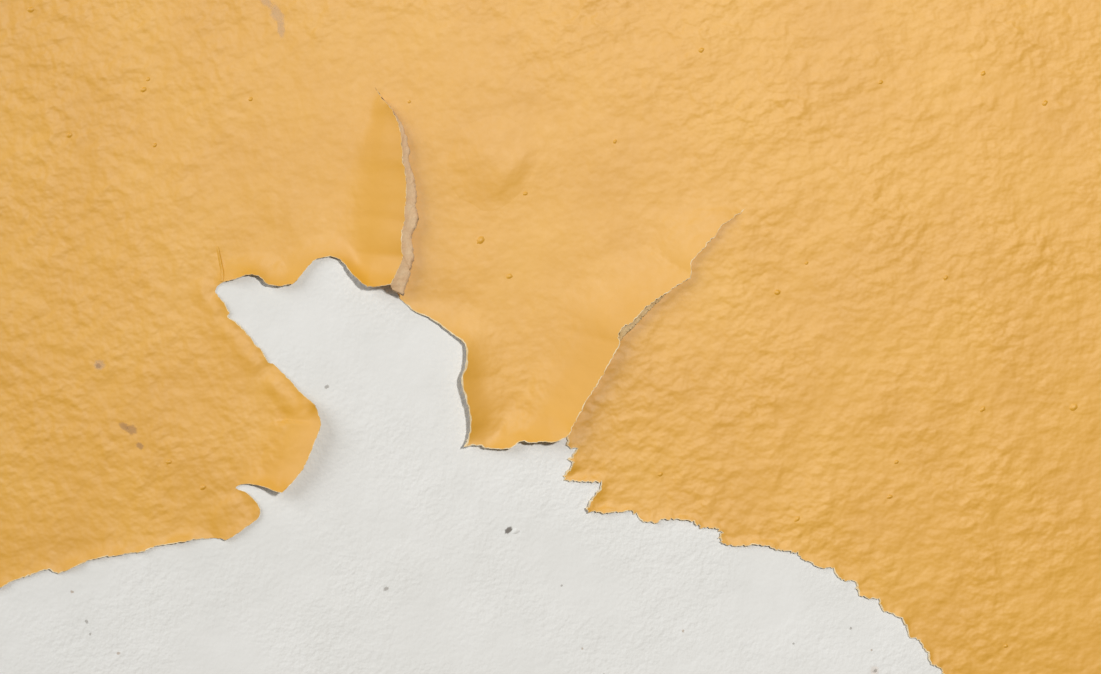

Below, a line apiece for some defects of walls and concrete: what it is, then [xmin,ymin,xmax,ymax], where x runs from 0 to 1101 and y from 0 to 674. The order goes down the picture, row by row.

peeling [0,88,942,674]